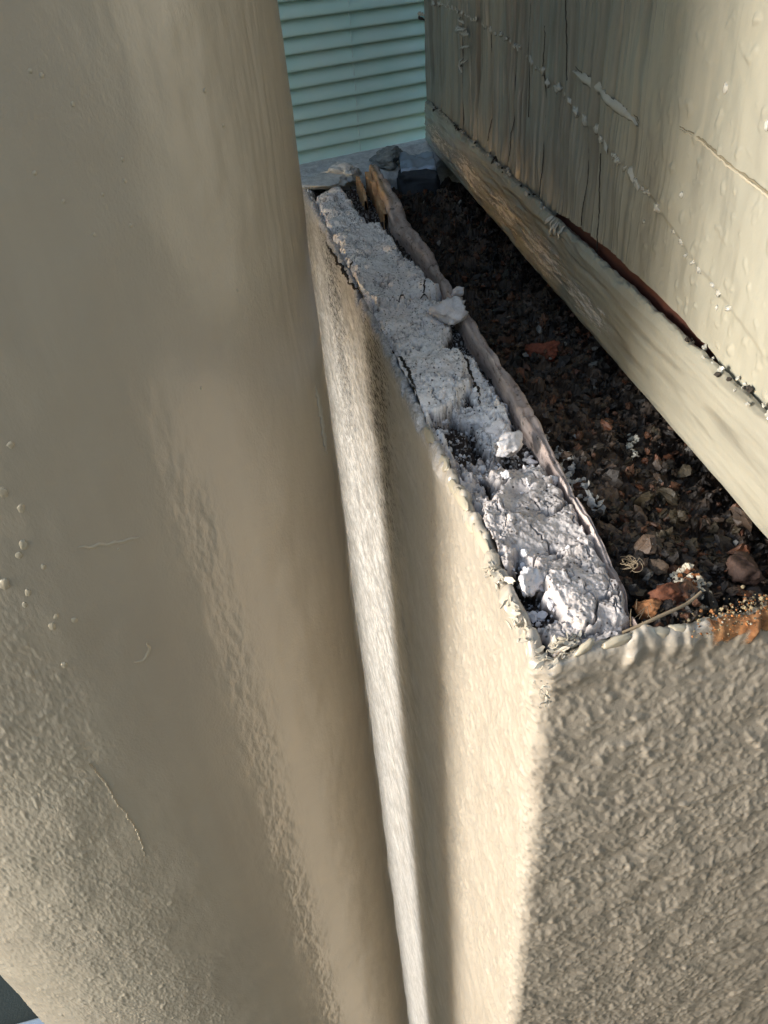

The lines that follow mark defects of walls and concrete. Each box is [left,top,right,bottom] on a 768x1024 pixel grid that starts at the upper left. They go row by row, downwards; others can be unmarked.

crack [487,0,567,161]
peeling [428,122,610,338]
crack [581,153,601,253]
crack [679,126,768,198]
peeling [479,552,586,709]